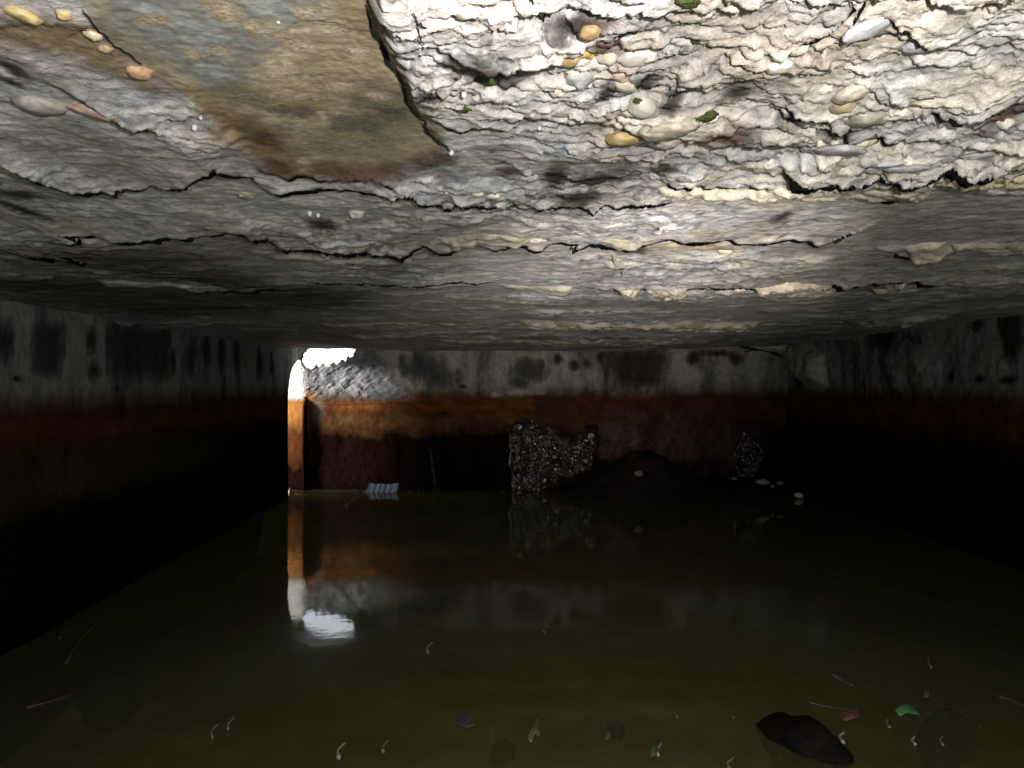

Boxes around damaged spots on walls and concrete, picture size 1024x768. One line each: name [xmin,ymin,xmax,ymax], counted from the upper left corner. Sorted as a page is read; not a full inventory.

crack [15,169,1022,217]
peeling [874,160,932,173]
peeling [961,151,1000,160]
crack [1,233,854,295]
damp [0,251,345,381]
damp [321,319,764,396]